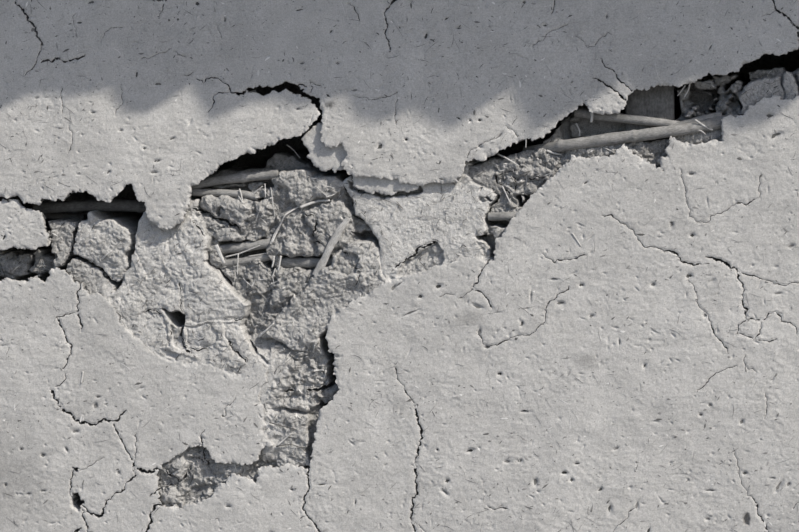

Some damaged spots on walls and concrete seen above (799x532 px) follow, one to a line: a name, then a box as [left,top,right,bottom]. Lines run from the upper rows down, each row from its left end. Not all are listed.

crack [13,0,87,77]
spalling [675,32,799,121]
crack [758,0,799,32]
crack [0,192,91,204]
crack [191,207,241,238]
crack [541,252,588,265]
crack [142,282,248,363]
spalling [0,103,722,508]
crack [476,286,571,348]
crack [600,213,799,391]
crack [48,224,210,532]
crack [393,366,427,532]